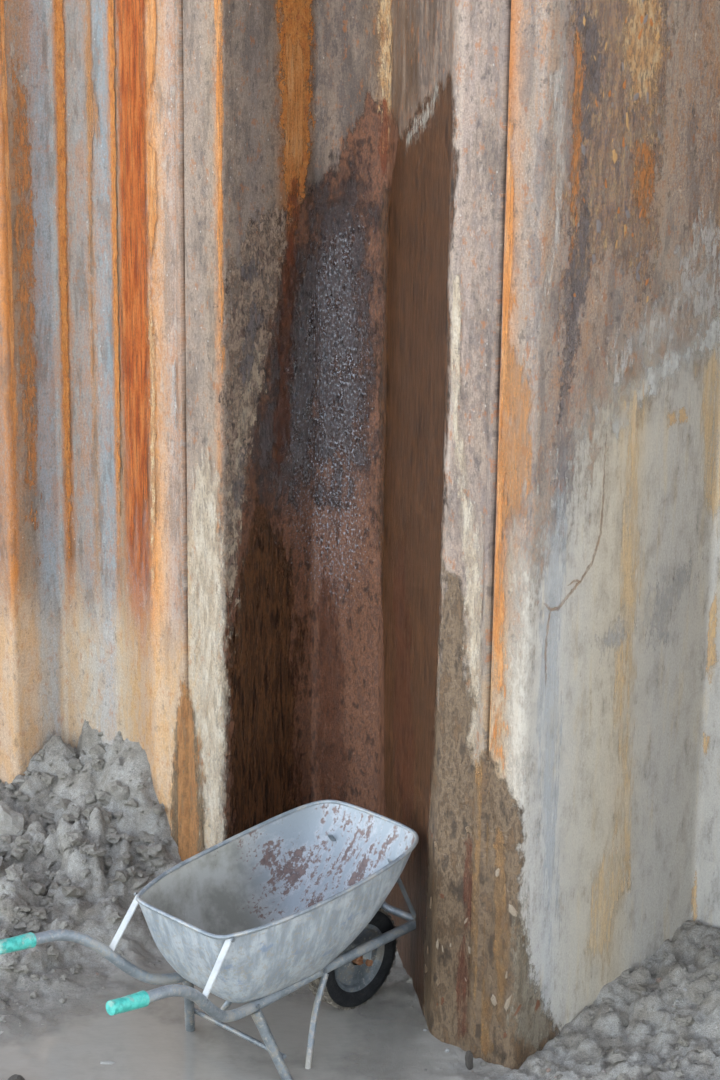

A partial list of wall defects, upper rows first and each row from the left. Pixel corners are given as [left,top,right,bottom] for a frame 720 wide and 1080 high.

rust [54,0,72,558]
rust [85,0,157,583]
rust [213,0,317,648]
leakage [190,72,720,1057]
rust [491,84,538,769]
crack [545,434,607,683]
peeling [489,971,521,1019]